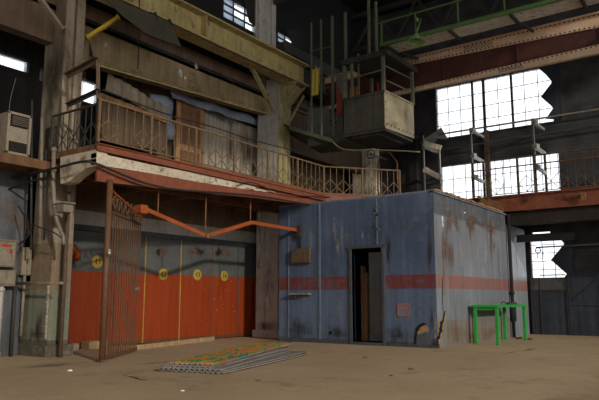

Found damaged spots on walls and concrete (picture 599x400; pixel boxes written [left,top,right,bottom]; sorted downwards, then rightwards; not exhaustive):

spalling [414,318,437,345]